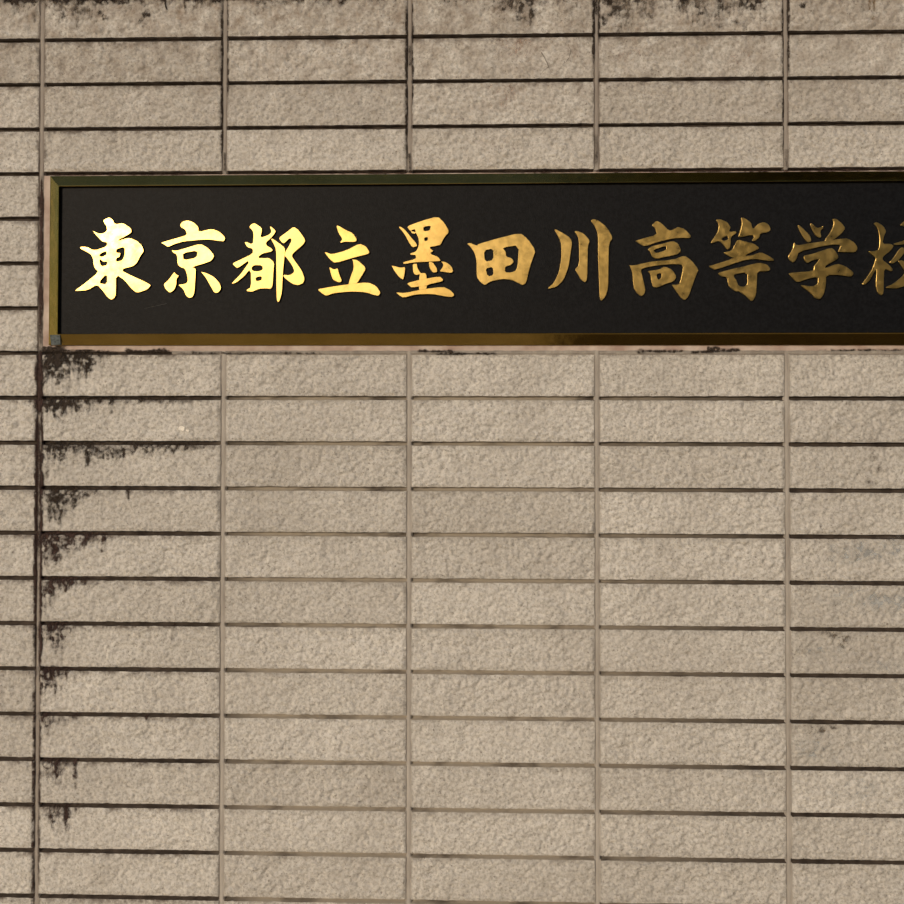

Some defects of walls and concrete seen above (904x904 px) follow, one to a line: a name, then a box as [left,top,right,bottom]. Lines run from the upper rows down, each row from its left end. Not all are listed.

leakage [3,0,129,27]
leakage [493,0,534,23]
leakage [678,0,728,22]
leakage [592,0,653,59]
leakage [780,0,790,141]
leakage [184,0,234,170]
leakage [254,5,479,175]
leakage [518,152,771,173]
leakage [783,163,900,172]
leakage [637,346,740,354]
leakage [30,179,204,892]